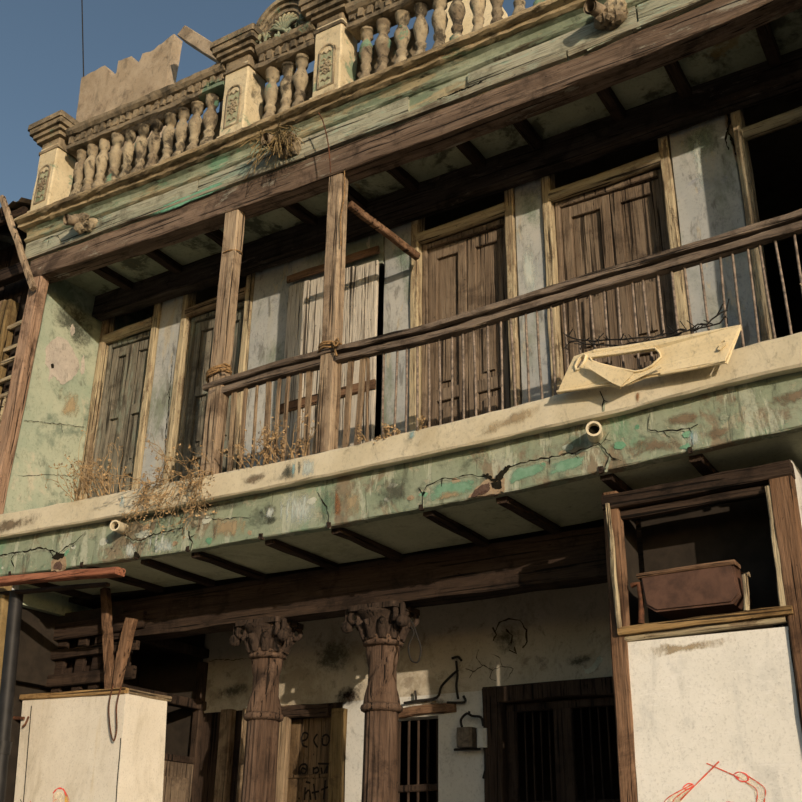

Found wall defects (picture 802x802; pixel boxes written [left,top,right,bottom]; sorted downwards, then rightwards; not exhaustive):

crack [725,113,739,171]
leakage [58,307,90,344]
peeling [45,324,85,400]
crack [648,414,698,449]
crack [419,474,485,508]
peeling [407,444,584,501]
crack [0,532,87,566]
crack [125,517,251,552]